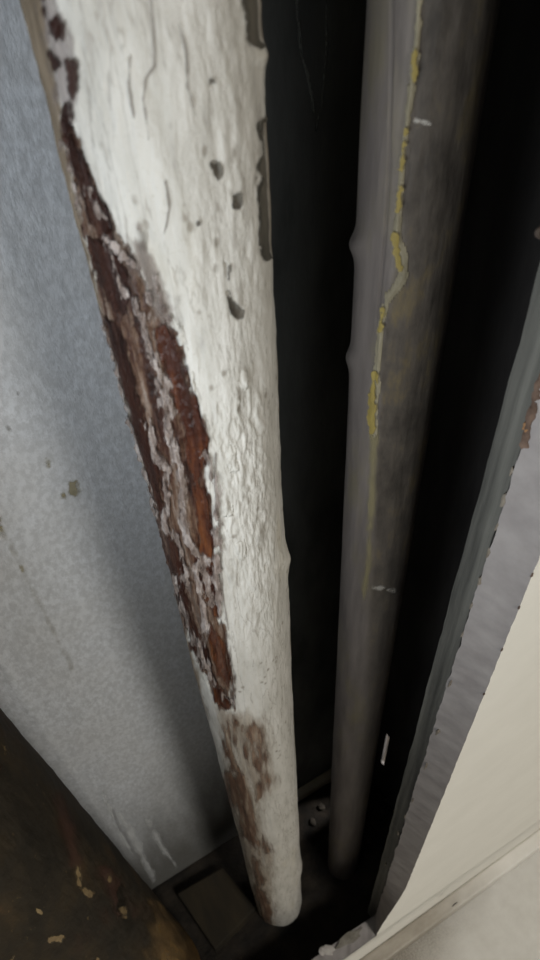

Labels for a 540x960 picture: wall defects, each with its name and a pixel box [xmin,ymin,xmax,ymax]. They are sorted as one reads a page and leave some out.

peeling [210,162,223,180]
peeling [232,193,243,209]
peeling [256,117,273,261]
peeling [227,265,245,319]
rust [41,0,272,924]
peeling [76,866,94,898]